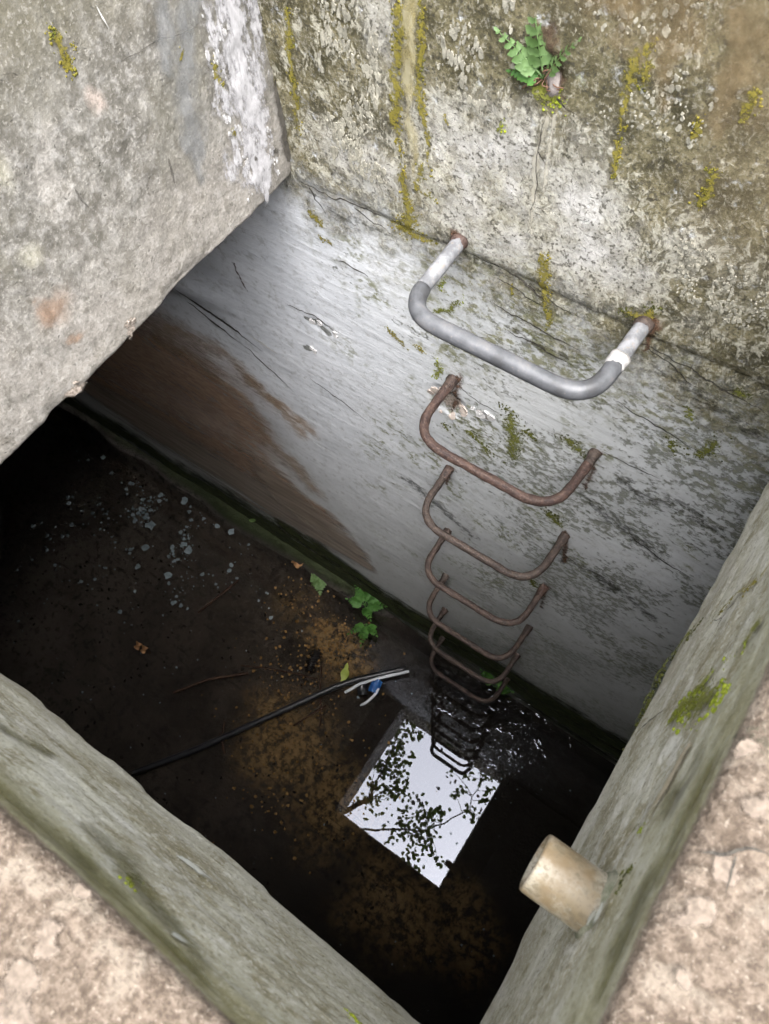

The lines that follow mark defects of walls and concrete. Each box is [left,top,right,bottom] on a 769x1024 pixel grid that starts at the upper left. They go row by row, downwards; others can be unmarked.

damp [218,0,291,202]
corrosion [643,318,661,351]
crack [176,290,364,419]
corrosion [441,374,462,410]
corrosion [440,465,454,485]
corrosion [583,448,603,489]
corrosion [557,530,570,564]